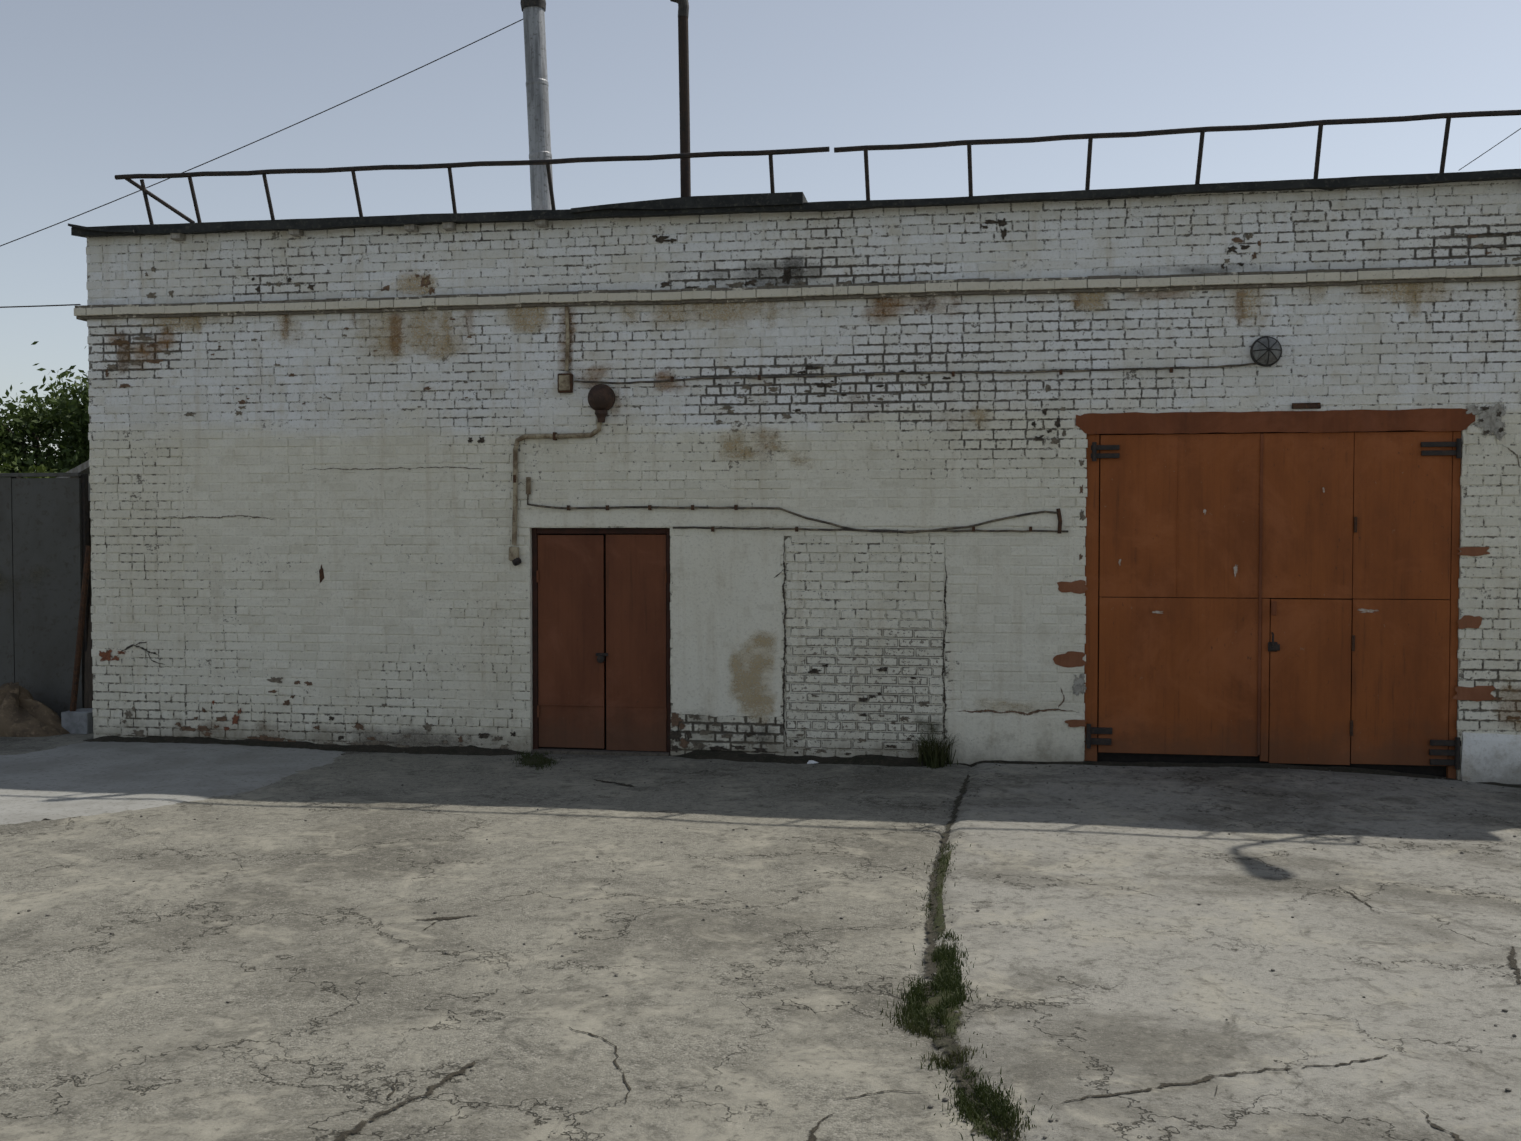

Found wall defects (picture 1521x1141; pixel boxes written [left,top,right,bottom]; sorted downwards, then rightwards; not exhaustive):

spalling [99,649,125,661]
crack [922,775,1023,1141]
crack [1498,946,1521,984]
crack [334,1059,486,1141]
crack [806,1090,911,1141]
crack [1062,1054,1388,1103]
crack [1415,1106,1464,1141]